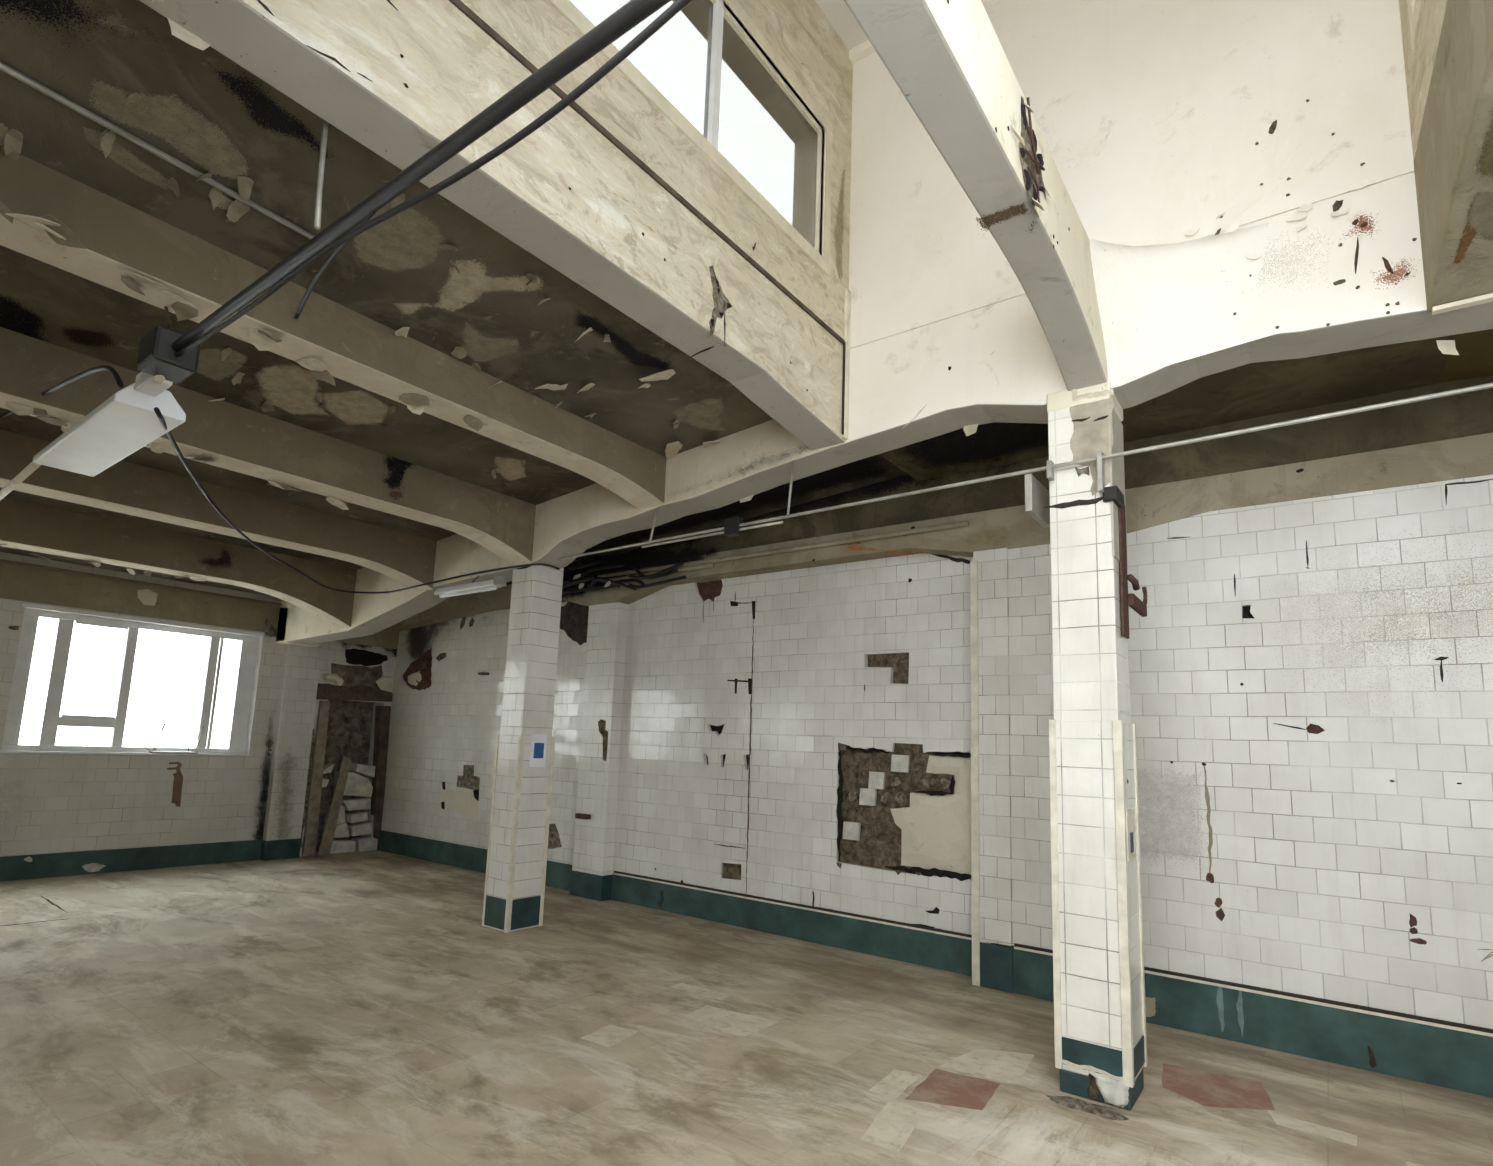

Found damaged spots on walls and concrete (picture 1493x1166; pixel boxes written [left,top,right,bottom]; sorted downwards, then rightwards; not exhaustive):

peeling [151,0,210,51]
crack [257,0,274,16]
crack [306,45,373,82]
peeling [80,72,256,222]
spalling [995,96,1054,218]
damp [1464,109,1493,242]
peeling [349,193,550,371]
spalling [709,266,732,337]
peeling [196,327,430,431]
peeling [868,653,909,684]
peeling [441,765,480,810]
peeling [836,743,971,881]